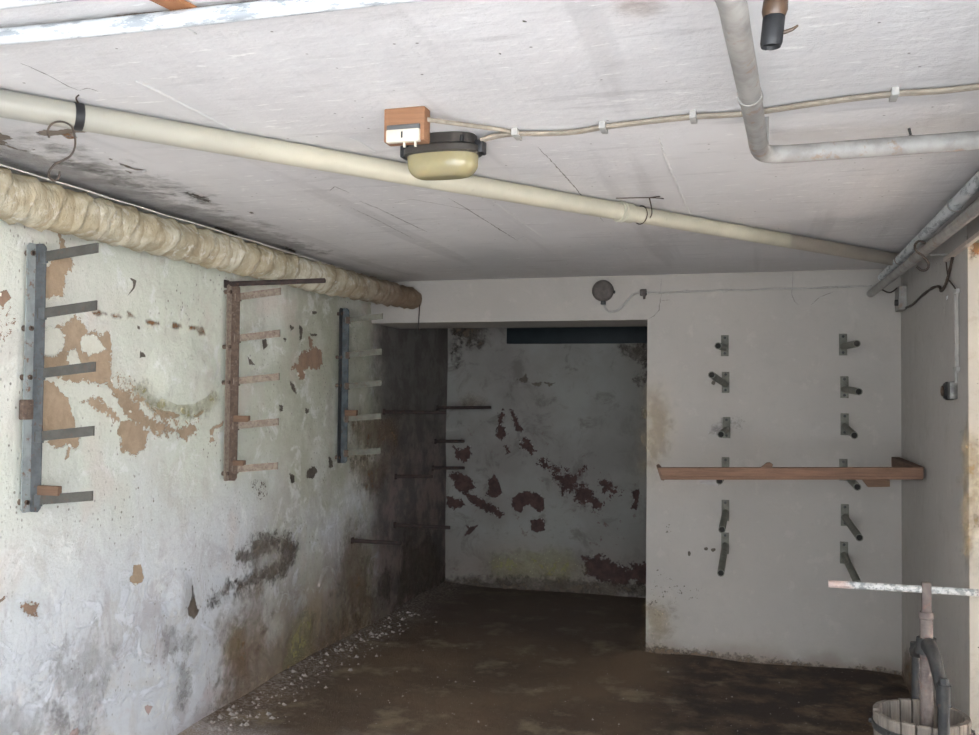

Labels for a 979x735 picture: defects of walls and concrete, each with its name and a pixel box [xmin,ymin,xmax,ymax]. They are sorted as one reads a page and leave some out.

peeling [0,133,35,152]
peeling [36,129,85,147]
peeling [0,290,18,342]
peeling [43,314,224,460]
peeling [283,325,323,394]
peeling [289,466,317,484]
peeling [446,445,545,533]
peeling [495,408,640,514]
leakage [207,530,298,608]
peeling [20,601,39,617]